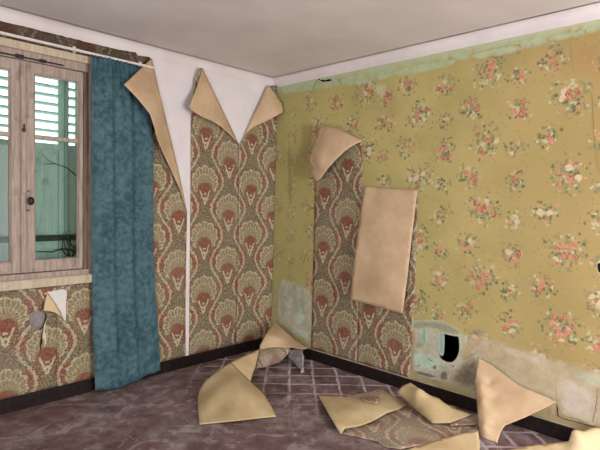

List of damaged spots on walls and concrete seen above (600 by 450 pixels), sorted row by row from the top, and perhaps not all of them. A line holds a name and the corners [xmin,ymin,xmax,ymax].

peeling [124,58,187,211]
peeling [308,126,362,181]
peeling [189,20,600,144]
peeling [43,289,67,322]
peeling [350,186,418,313]
flaking render [411,320,600,428]